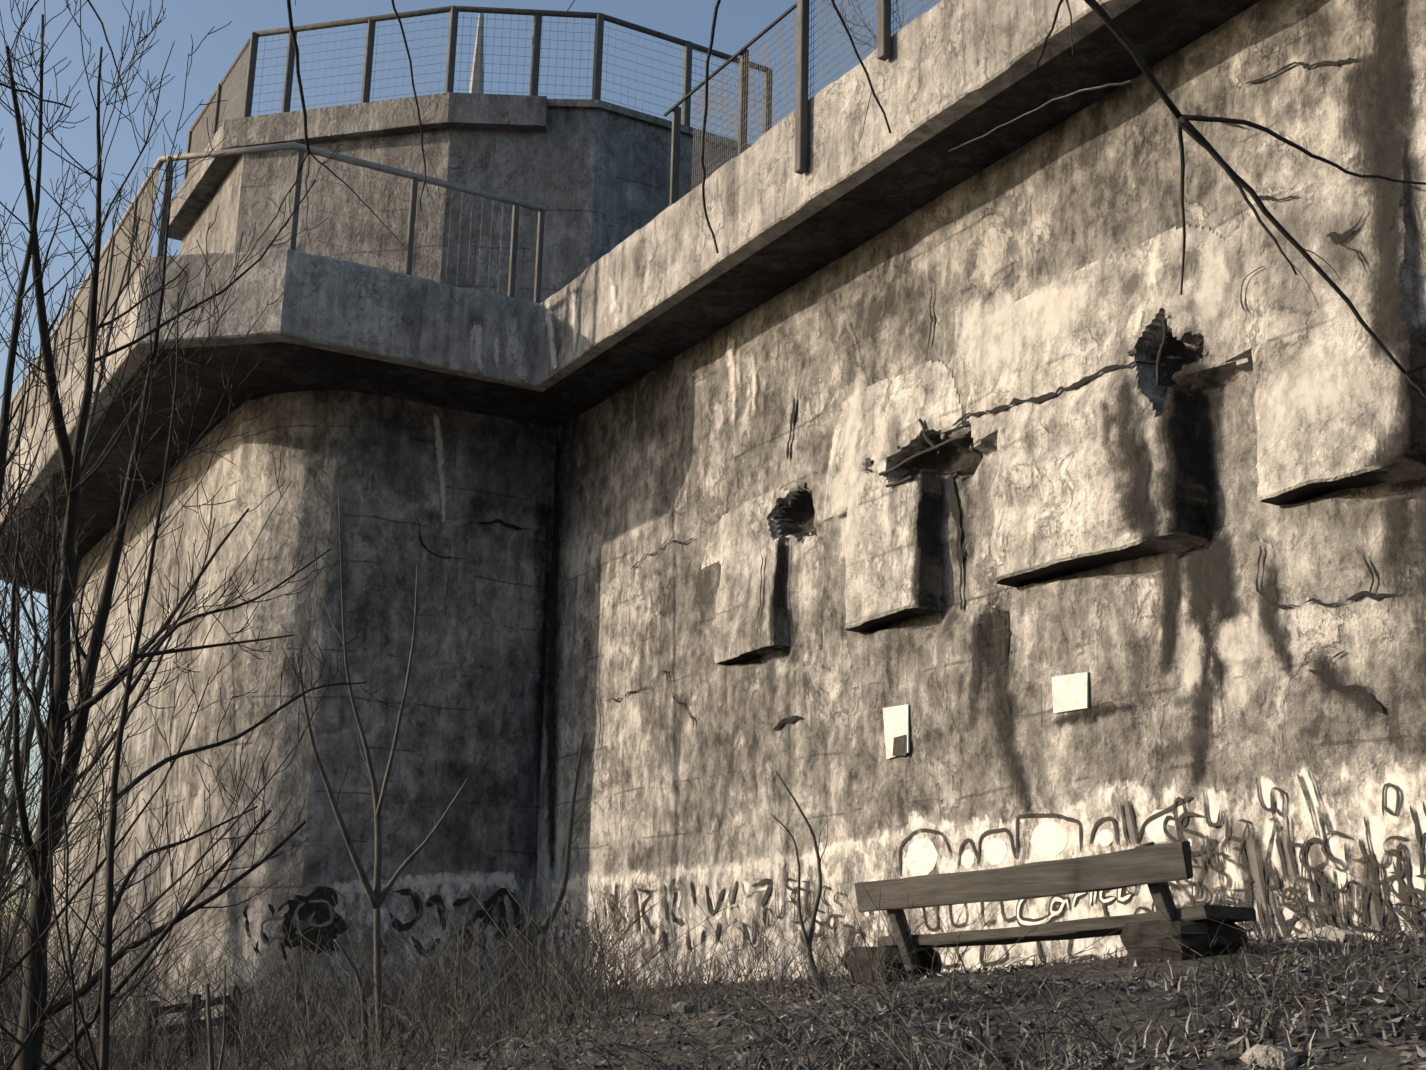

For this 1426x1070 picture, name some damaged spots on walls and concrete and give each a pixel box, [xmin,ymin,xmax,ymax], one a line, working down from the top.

crack [952,361,1156,432]
spalling [1127,314,1208,405]
water stain [1338,0,1426,699]
spalling [774,482,817,542]
spalling [831,418,983,572]
water stain [911,464,962,616]
water stain [1101,360,1289,785]
crack [1255,546,1400,608]
water stain [534,437,563,872]
water stain [967,595,1034,817]
water stain [1309,653,1372,716]